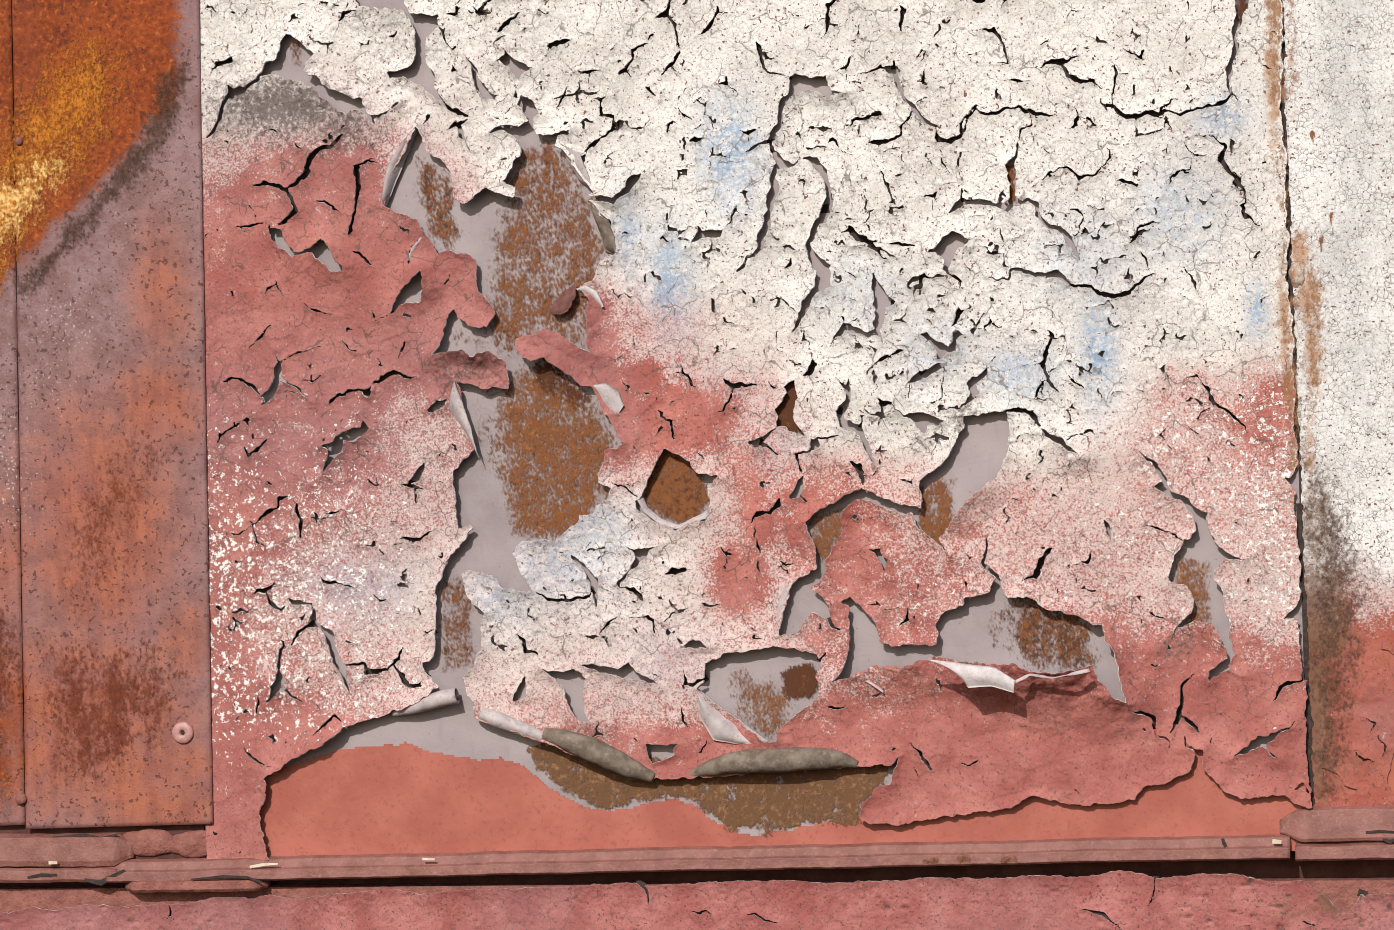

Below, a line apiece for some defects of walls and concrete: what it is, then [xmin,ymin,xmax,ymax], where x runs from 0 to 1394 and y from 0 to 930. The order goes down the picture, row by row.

peeling [207,34,399,138]
peeling [354,0,443,100]
crack [439,0,737,150]
peeling [1226,0,1249,100]
corrosion [0,37,191,294]
corrosion [415,157,460,248]
crack [217,282,447,538]
corrosion [454,134,617,540]
peeling [259,51,1306,857]
crack [676,0,1315,807]
crack [254,579,438,733]
corrosion [526,743,898,838]